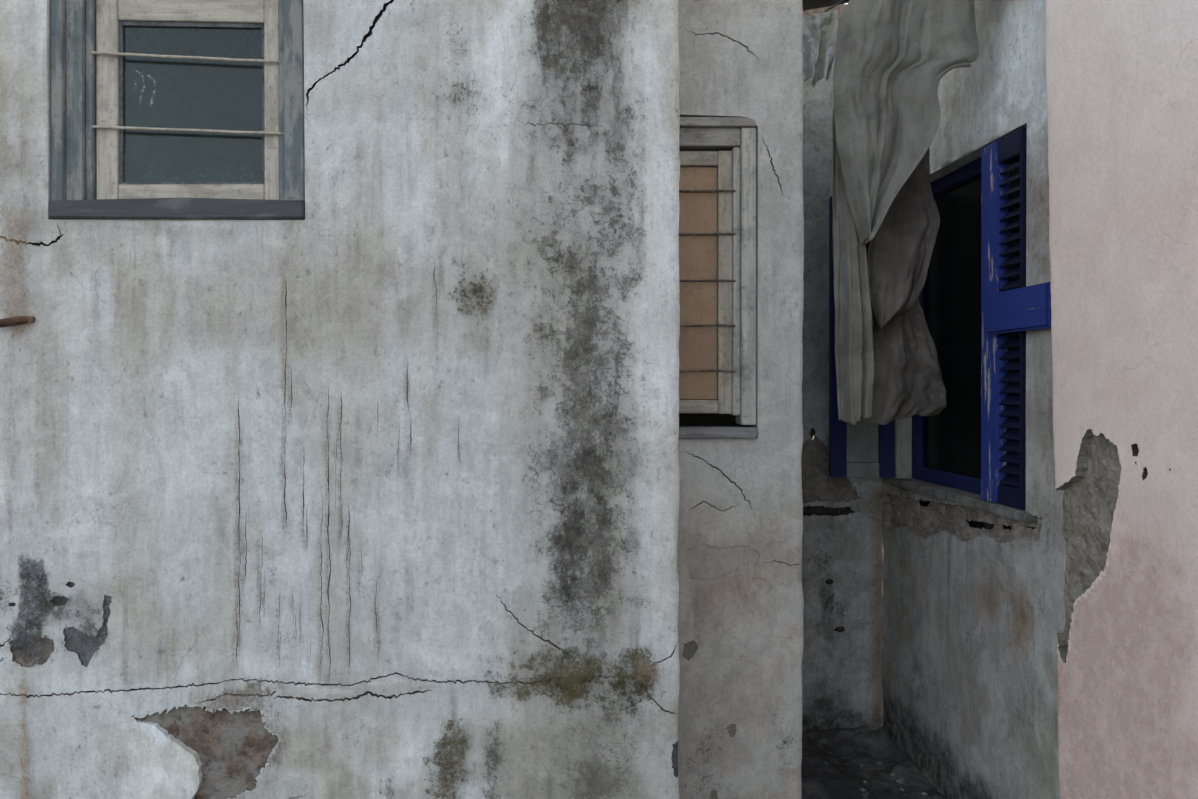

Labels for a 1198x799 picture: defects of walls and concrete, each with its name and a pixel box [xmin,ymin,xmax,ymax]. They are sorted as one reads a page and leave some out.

crack [306,0,394,112]
rust [0,207,34,346]
crack [0,223,64,246]
leakage [499,0,639,627]
crack [0,276,678,714]
crack [684,449,752,511]
spalling [883,492,1043,543]
spalling [1056,429,1122,663]
spalling [9,595,112,668]
spalling [51,581,75,606]
spalling [131,705,278,799]
leakage [482,720,504,799]